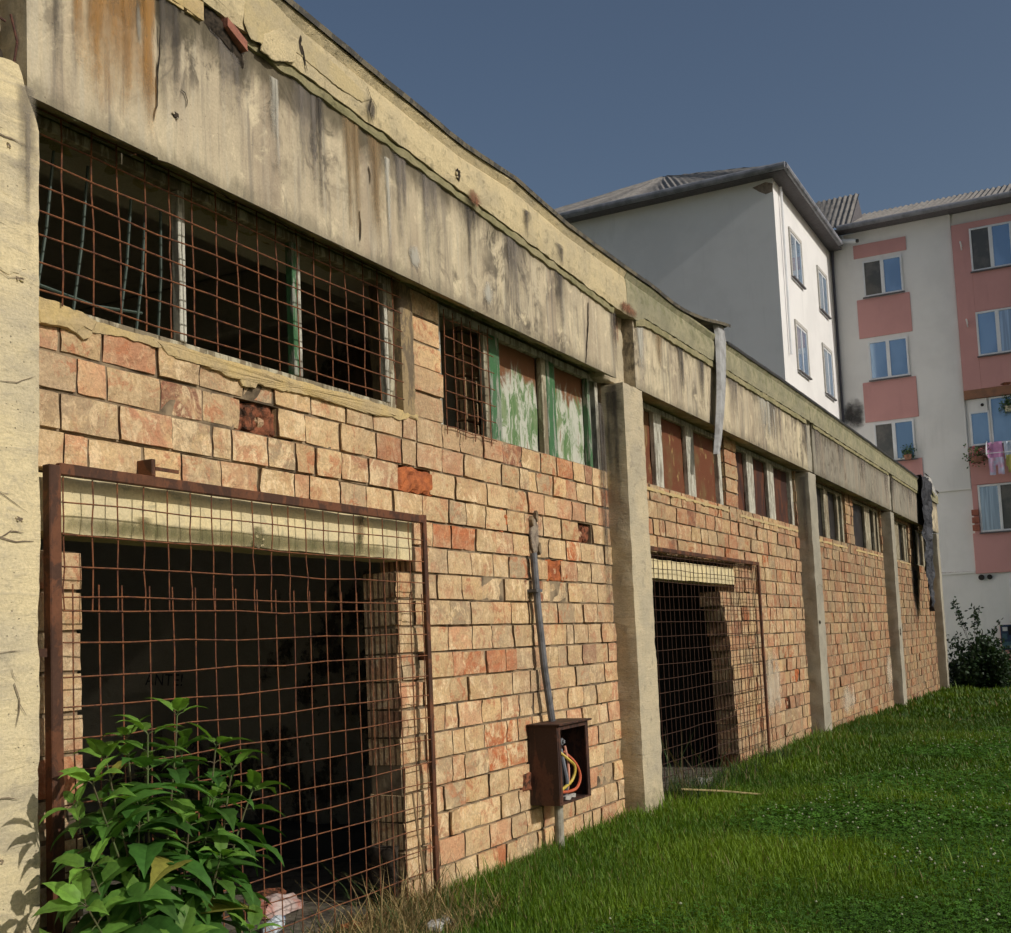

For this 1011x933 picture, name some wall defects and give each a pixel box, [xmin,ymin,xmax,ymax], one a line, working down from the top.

corrosion [76,0,154,92]
crack [154,23,188,118]
peeling [165,0,372,102]
leakage [466,205,475,237]
peeling [158,342,396,417]
leakage [310,341,373,398]
spalling [234,402,284,440]
crack [0,491,34,543]
spalling [395,466,433,497]
crack [0,650,27,726]
mould [260,571,370,779]
mould [109,723,362,824]